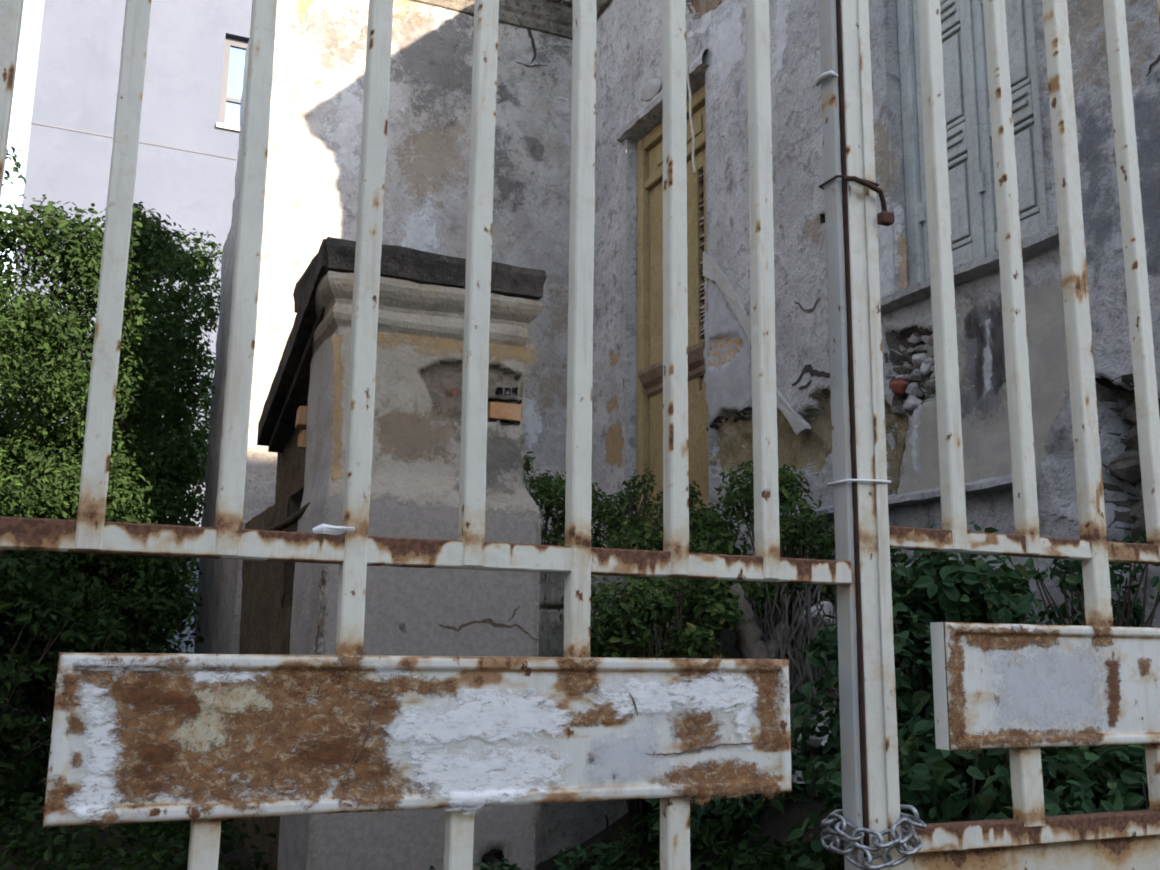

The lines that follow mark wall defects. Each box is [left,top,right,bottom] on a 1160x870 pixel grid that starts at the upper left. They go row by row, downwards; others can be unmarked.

spalling [687,0,721,20]
spalling [419,360,463,422]
spalling [487,364,523,425]
spalling [884,325,936,495]
spalling [1095,374,1147,543]
crack [439,605,538,640]